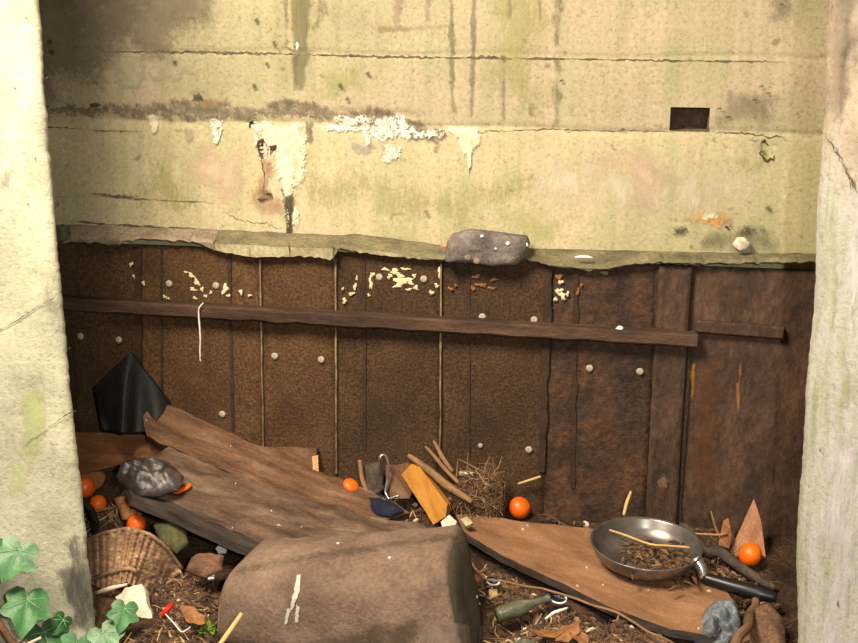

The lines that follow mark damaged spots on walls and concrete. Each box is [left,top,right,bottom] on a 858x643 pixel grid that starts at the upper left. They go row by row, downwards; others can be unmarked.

leakage [39,0,206,99]
leakage [291,0,310,82]
efflorescence [326,112,480,177]
crack [480,126,667,134]
crack [713,130,782,138]
crack [814,129,858,193]